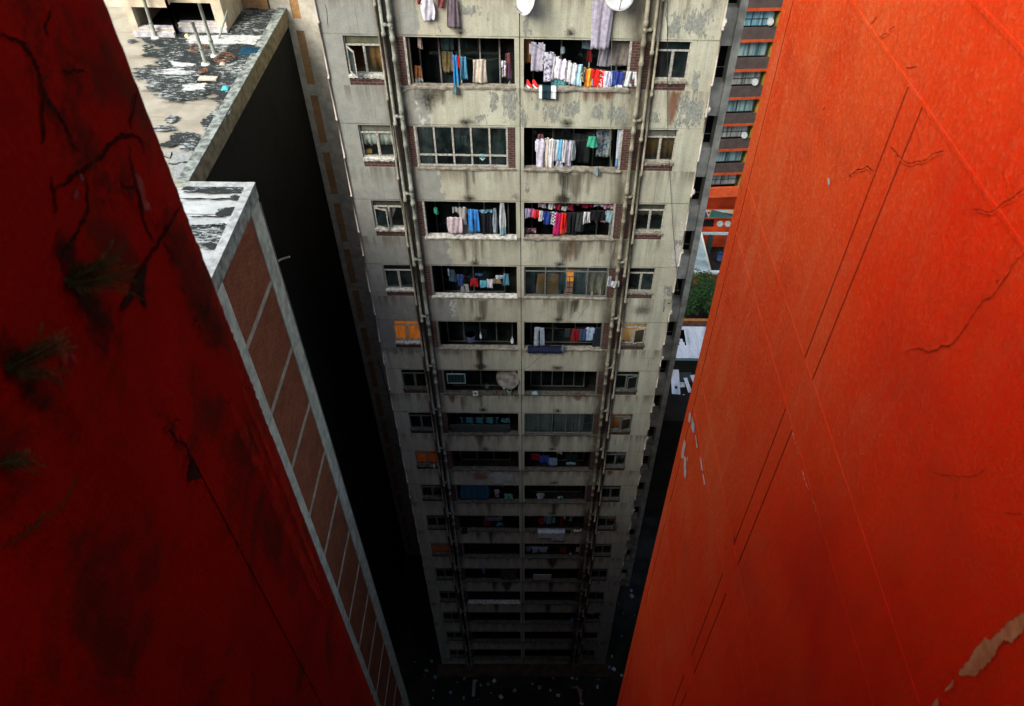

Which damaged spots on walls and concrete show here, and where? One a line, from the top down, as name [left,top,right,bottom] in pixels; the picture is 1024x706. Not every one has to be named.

peeling [668,3,721,41]
peeling [649,71,710,129]
crack [0,9,230,308]
crack [849,166,875,178]
crack [890,147,946,167]
crack [971,188,1024,216]
crack [902,252,1023,353]
peeling [681,412,705,484]
peeling [932,613,1024,706]